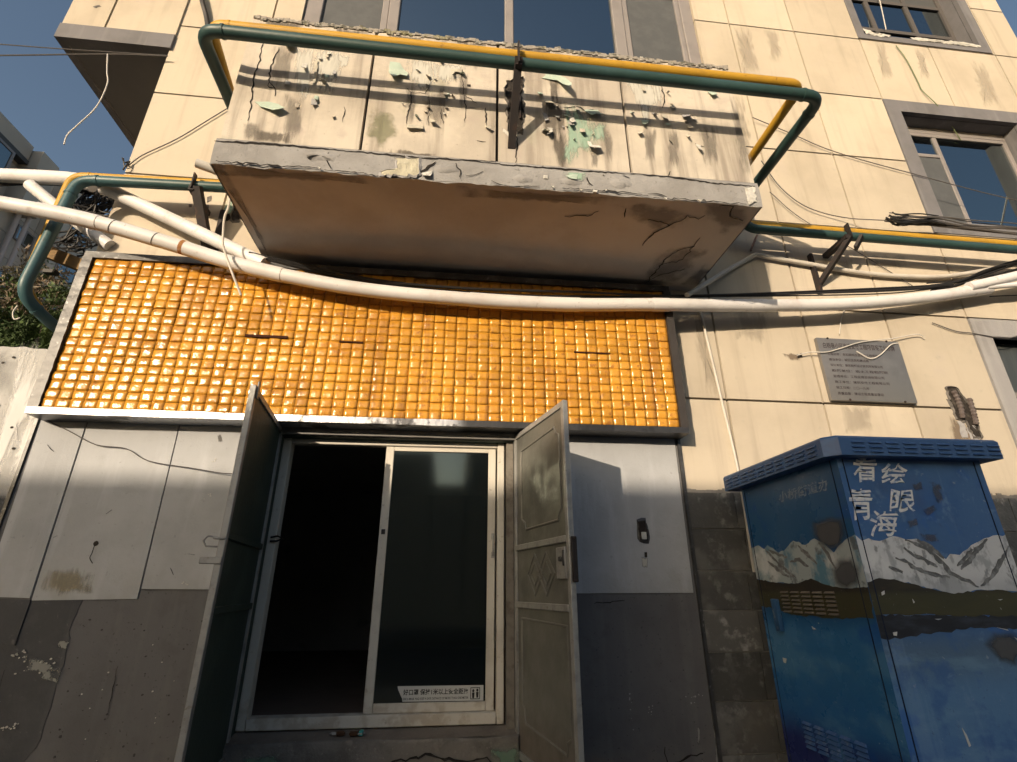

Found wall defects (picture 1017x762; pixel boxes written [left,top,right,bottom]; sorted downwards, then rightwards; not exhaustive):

peeling [256,47,349,110]
peeling [389,60,465,129]
peeling [542,74,572,86]
peeling [538,92,604,160]
peeling [627,83,703,150]
crack [216,44,755,284]
peeling [565,172,607,193]
crack [391,753,491,762]